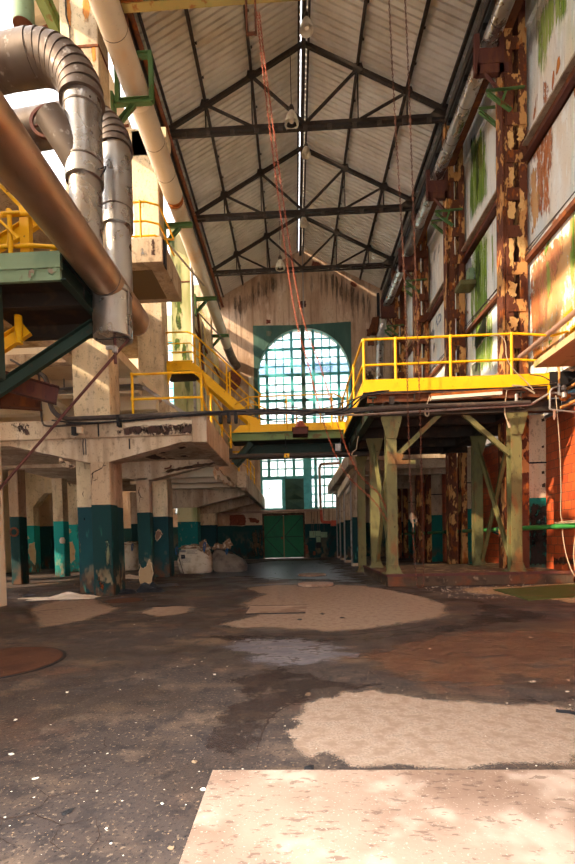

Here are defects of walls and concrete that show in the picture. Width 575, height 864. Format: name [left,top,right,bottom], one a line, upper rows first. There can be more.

damp [470,129,486,217]
peeling [507,127,525,150]
peeling [507,167,526,219]
rust [530,126,552,233]
peeling [508,281,517,297]
peeling [509,235,526,269]
rust [532,219,575,364]
damp [197,529,575,770]